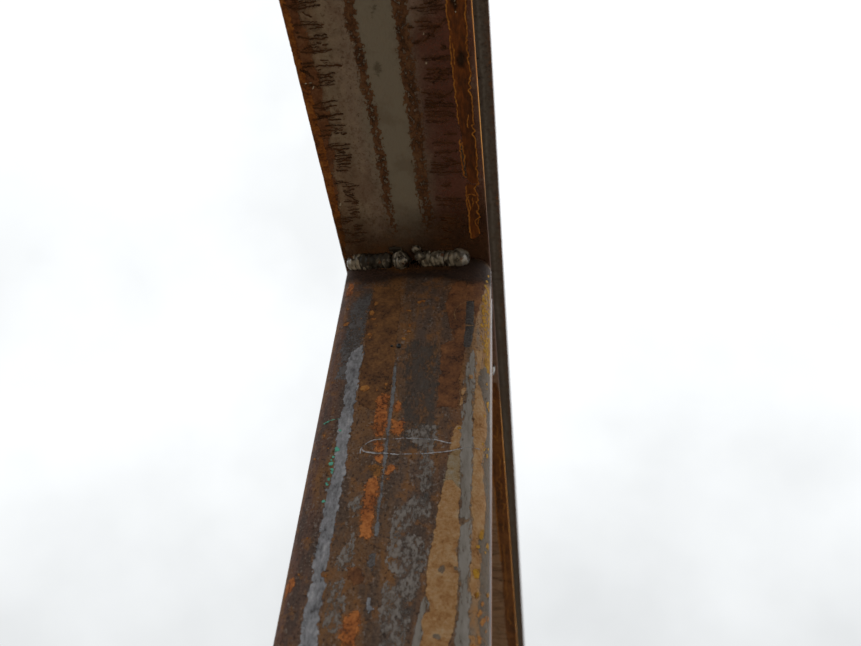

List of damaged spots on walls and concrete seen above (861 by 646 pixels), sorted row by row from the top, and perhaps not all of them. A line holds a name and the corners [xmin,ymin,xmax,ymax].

corrosion [279,0,346,257]
corrosion [343,0,398,234]
corrosion [390,0,436,228]
corrosion [445,0,481,239]
corrosion [358,287,425,539]
corrosion [420,275,517,646]
peeling [464,300,475,347]
corrosion [338,610,361,646]